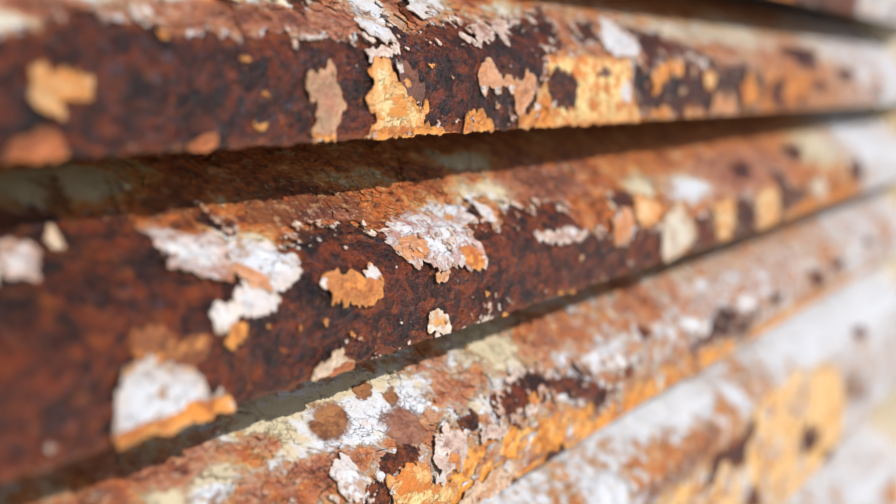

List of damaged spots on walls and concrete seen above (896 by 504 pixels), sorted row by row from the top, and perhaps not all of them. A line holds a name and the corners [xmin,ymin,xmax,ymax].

corrosion [0,0,603,163]
peeling [305,59,347,144]
peeling [353,14,445,141]
peeling [459,14,641,130]
corrosion [616,21,855,121]
peeling [112,223,303,449]
corrosion [0,177,666,504]
peeling [319,262,384,309]
peeling [379,201,501,284]
corrosion [446,259,876,504]
corrosion [682,161,760,254]
corrosion [765,156,864,224]